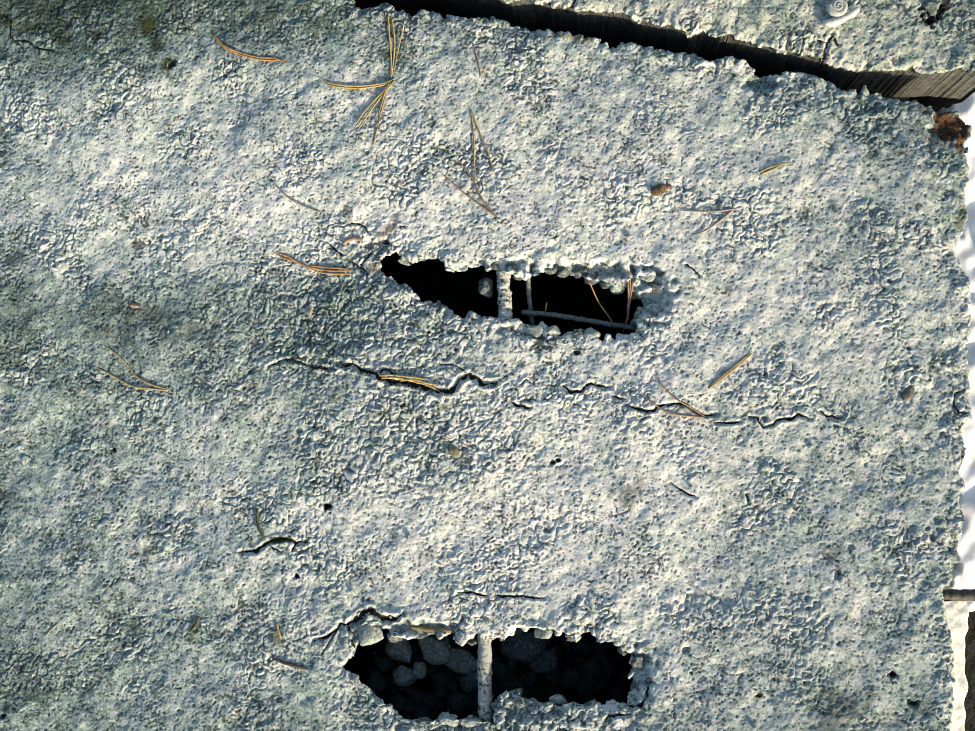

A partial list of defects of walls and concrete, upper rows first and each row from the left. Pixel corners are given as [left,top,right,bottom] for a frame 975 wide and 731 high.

crack [817,35,838,63]
spalling [380,252,665,341]
crack [268,357,495,394]
crack [511,379,532,410]
crack [564,383,840,428]
crack [244,537,307,554]
spalling [342,623,646,730]